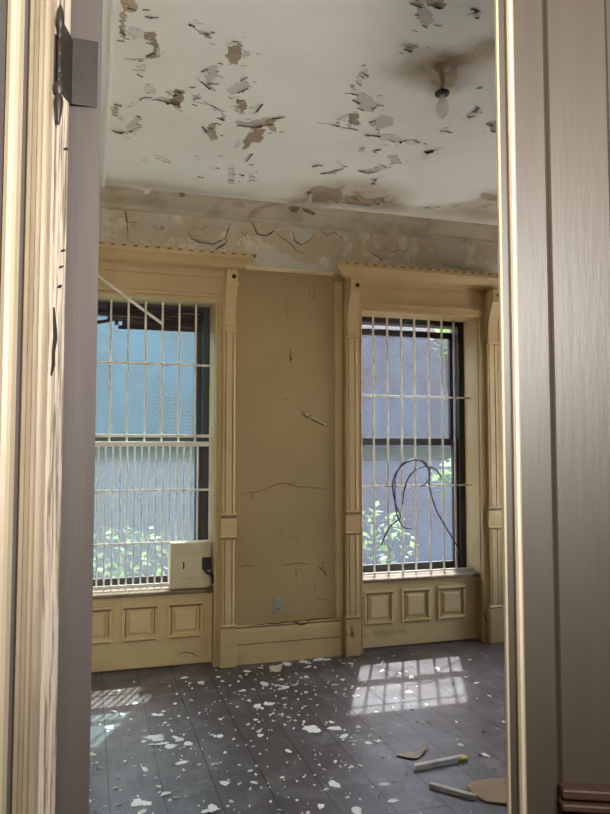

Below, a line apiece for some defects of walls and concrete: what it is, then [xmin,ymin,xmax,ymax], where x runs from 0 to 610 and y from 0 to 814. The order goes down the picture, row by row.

peeling [410,0,447,32]
peeling [110,0,286,183]
peeling [321,65,443,184]
peeling [462,106,496,133]
peeling [289,185,386,215]
peeling [479,192,497,208]
crack [215,223,305,254]